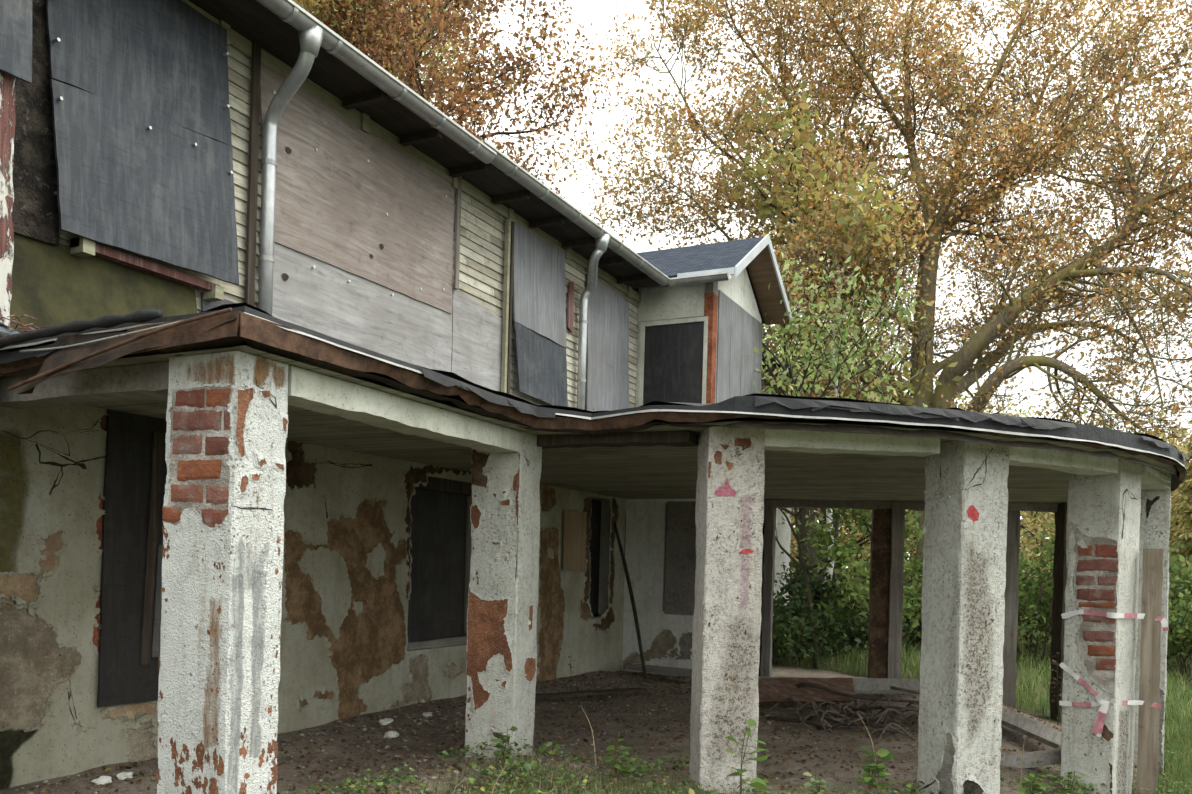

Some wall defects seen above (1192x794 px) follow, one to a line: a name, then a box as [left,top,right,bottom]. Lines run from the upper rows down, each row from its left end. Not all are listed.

leakage [0,433,28,573]
peeling [0,528,101,732]
crack [2,427,106,495]
flaking render [162,380,319,559]
leakage [228,541,266,794]
peeling [271,449,565,743]
peeling [579,494,619,634]
peeling [622,628,693,670]
flaking render [1066,519,1119,698]
leakage [0,729,37,790]
peeling [95,690,224,794]
peeling [239,695,278,794]